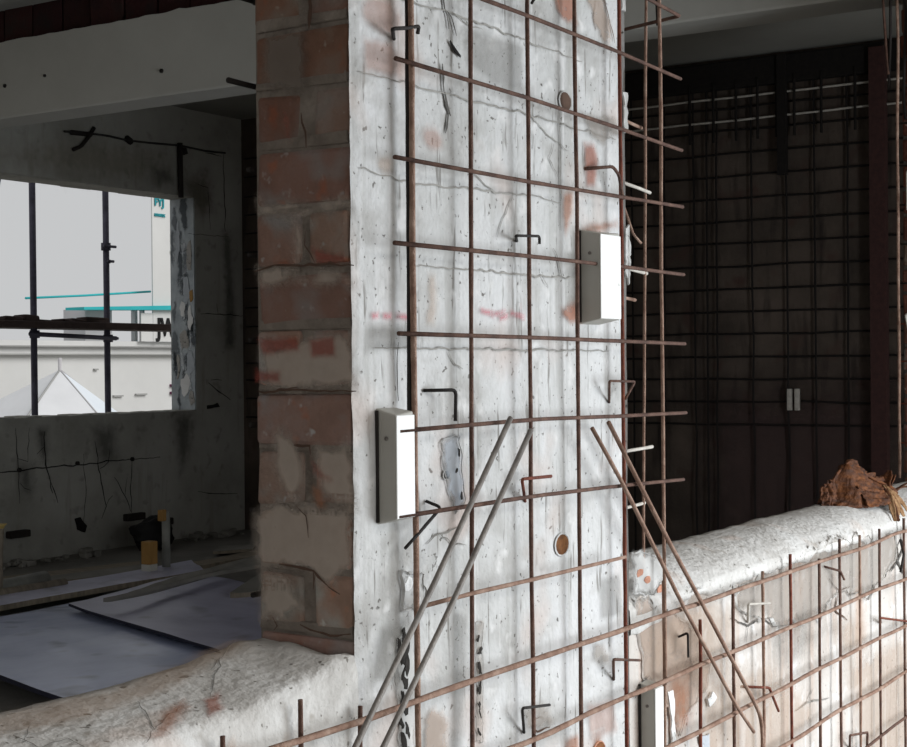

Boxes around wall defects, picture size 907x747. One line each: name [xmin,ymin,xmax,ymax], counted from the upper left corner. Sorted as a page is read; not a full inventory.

spalling [226,77,256,90]
crack [359,0,616,237]
rust [586,148,597,184]
crack [0,428,157,522]
peeling [170,198,196,410]
spalling [268,0,907,747]